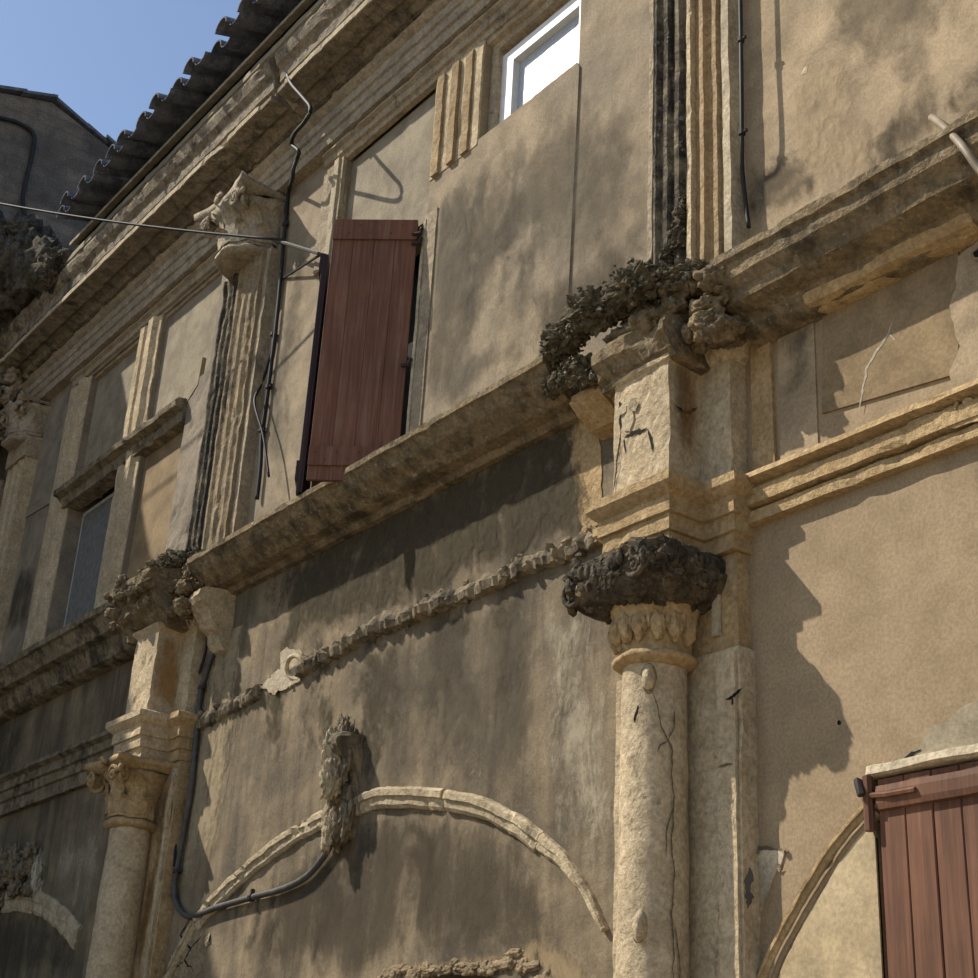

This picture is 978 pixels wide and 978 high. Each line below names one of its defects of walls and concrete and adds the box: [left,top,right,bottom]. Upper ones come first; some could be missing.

water stain [801,63,857,169]
water stain [752,165,811,207]
crack [858,319,895,412]
crack [613,401,653,493]
water stain [271,424,585,651]
water stain [184,625,243,878]
water stain [264,689,283,739]
water stain [356,640,399,772]
water stain [548,611,609,839]
water stain [261,821,537,969]
crack [633,688,681,978]